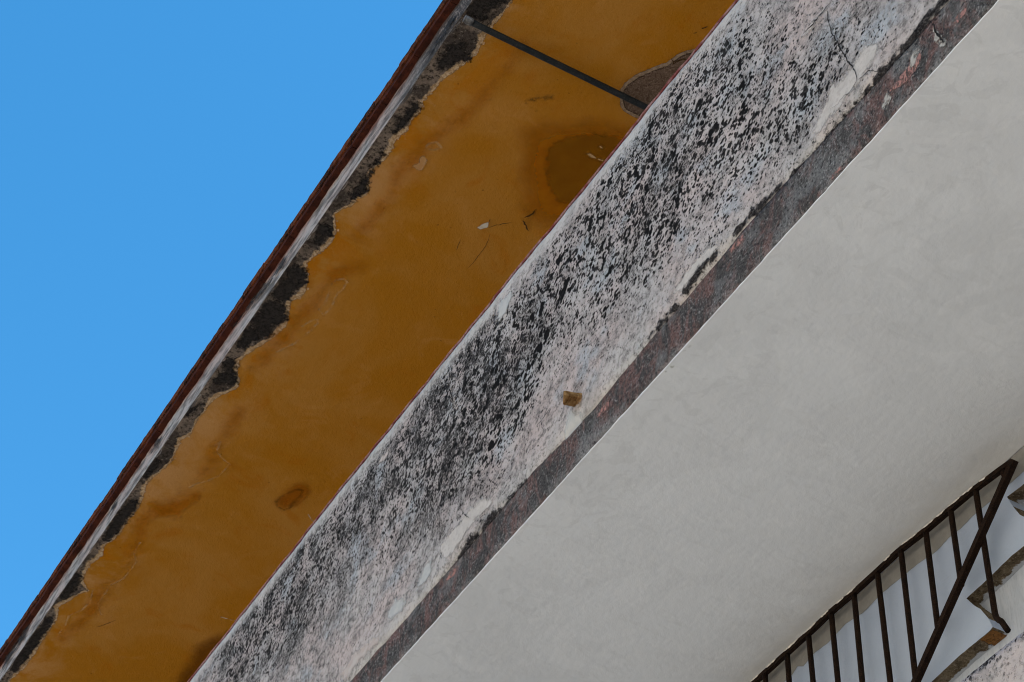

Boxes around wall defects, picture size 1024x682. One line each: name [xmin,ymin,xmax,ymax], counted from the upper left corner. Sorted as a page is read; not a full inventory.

leakage [426,0,507,70]
spalling [620,49,695,118]
crack [807,2,877,106]
peeling [813,44,879,134]
leakage [863,0,949,98]
leakage [526,126,628,220]
leakage [733,108,854,237]
peeling [0,0,513,682]
leakage [211,257,309,385]
leakage [647,248,718,339]
leakage [458,478,527,560]
leakage [181,639,221,682]